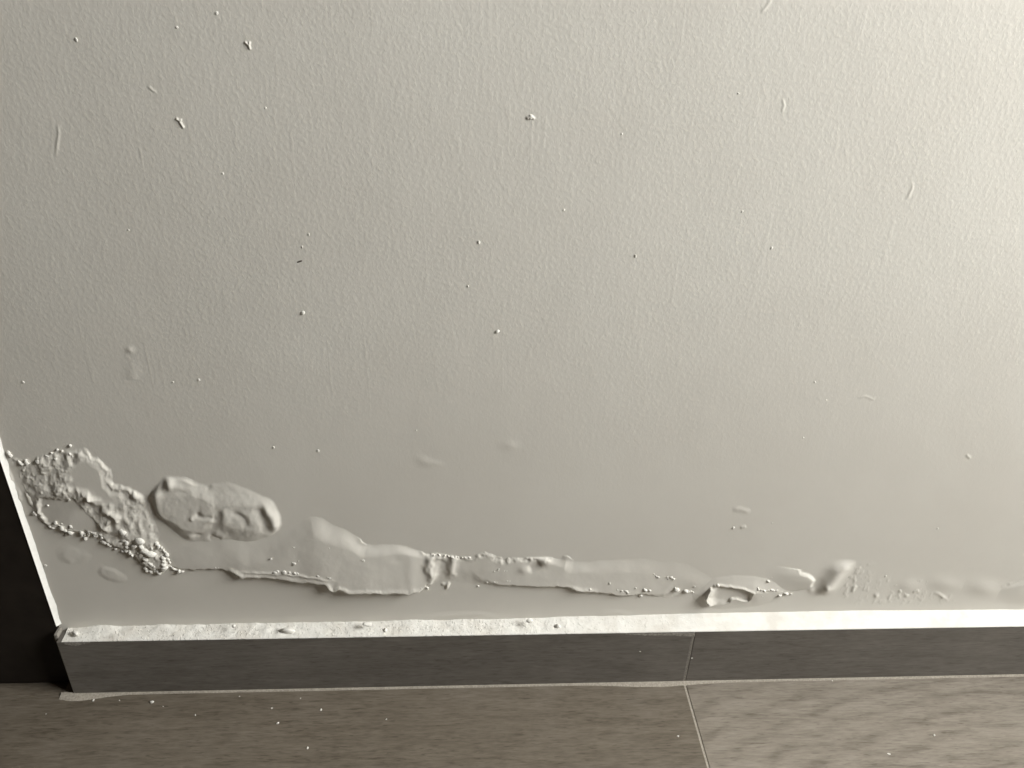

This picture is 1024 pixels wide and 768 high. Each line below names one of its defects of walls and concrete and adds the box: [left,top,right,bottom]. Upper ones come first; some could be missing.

peeling [169,516,792,610]